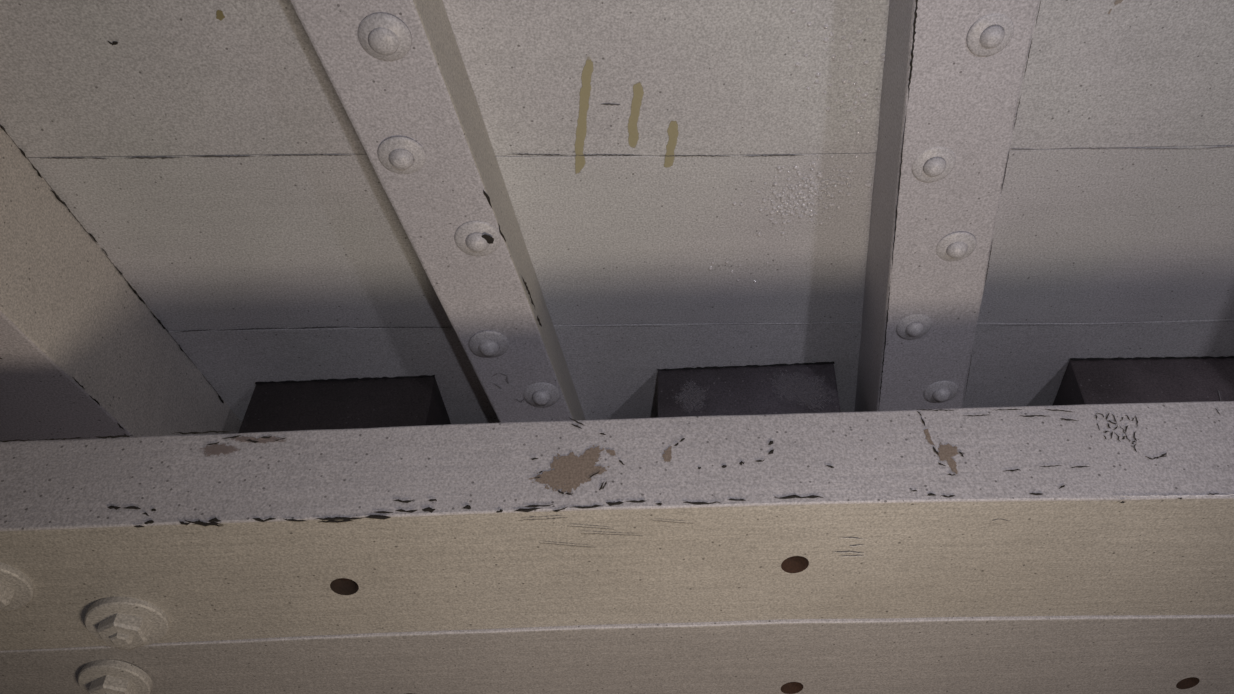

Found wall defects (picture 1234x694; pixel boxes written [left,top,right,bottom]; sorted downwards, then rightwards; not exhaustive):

peeling [496,433,662,513]
peeling [917,411,964,476]
peeling [252,499,437,523]